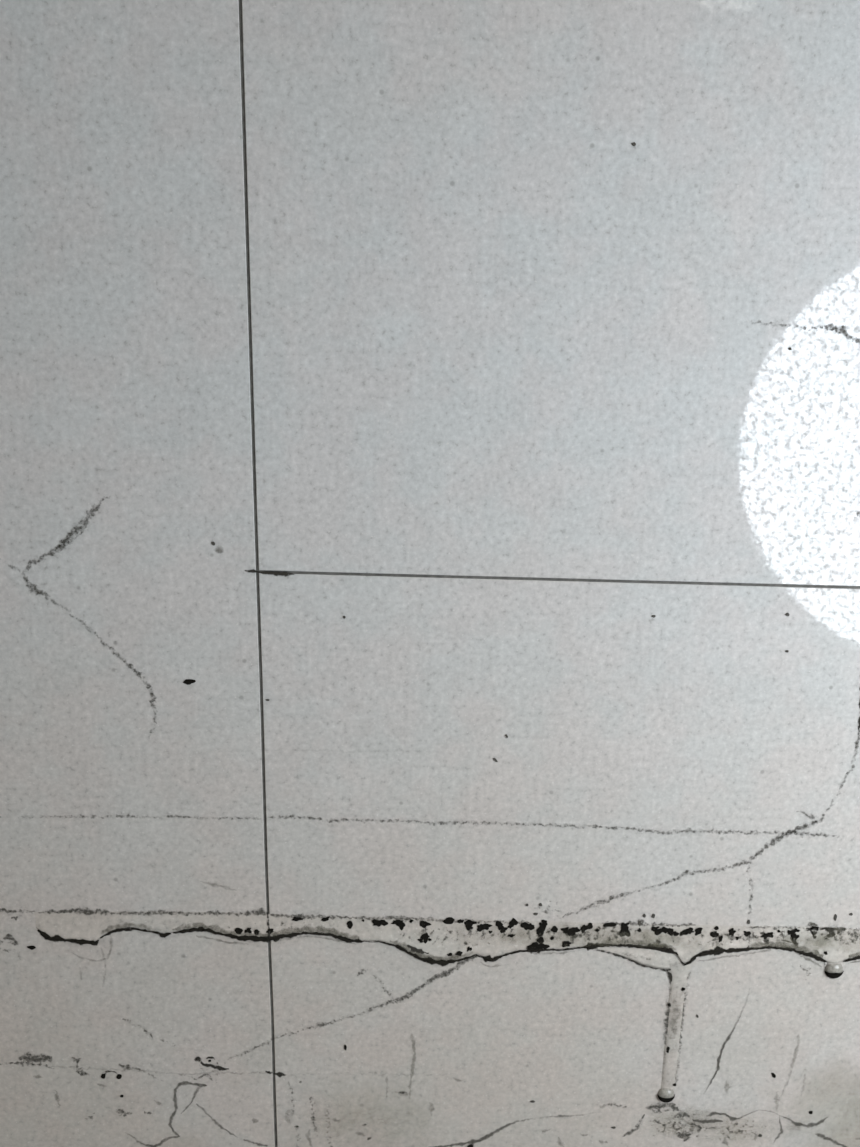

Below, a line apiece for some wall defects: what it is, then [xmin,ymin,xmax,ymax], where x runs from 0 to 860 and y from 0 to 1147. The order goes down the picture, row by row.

crack [770,322,860,343]
crack [24,499,104,599]
crack [95,632,156,733]
crack [272,702,860,908]
water stain [624,963,702,1141]